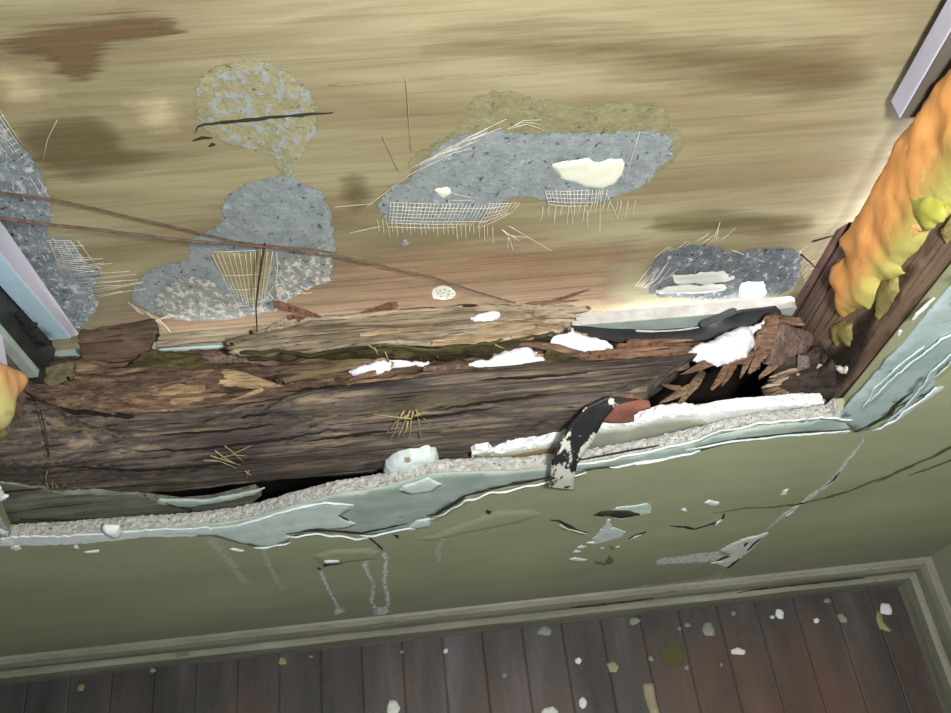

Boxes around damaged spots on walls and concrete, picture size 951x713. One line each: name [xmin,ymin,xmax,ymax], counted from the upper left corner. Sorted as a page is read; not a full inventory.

water stain [0,18,183,77]
peeling [0,73,43,101]
peeling [574,284,951,479]
peeling [0,429,566,554]
crack [670,433,951,532]
peeling [569,503,651,565]
crack [628,532,646,540]
water stain [320,571,346,615]
water stain [362,553,391,626]